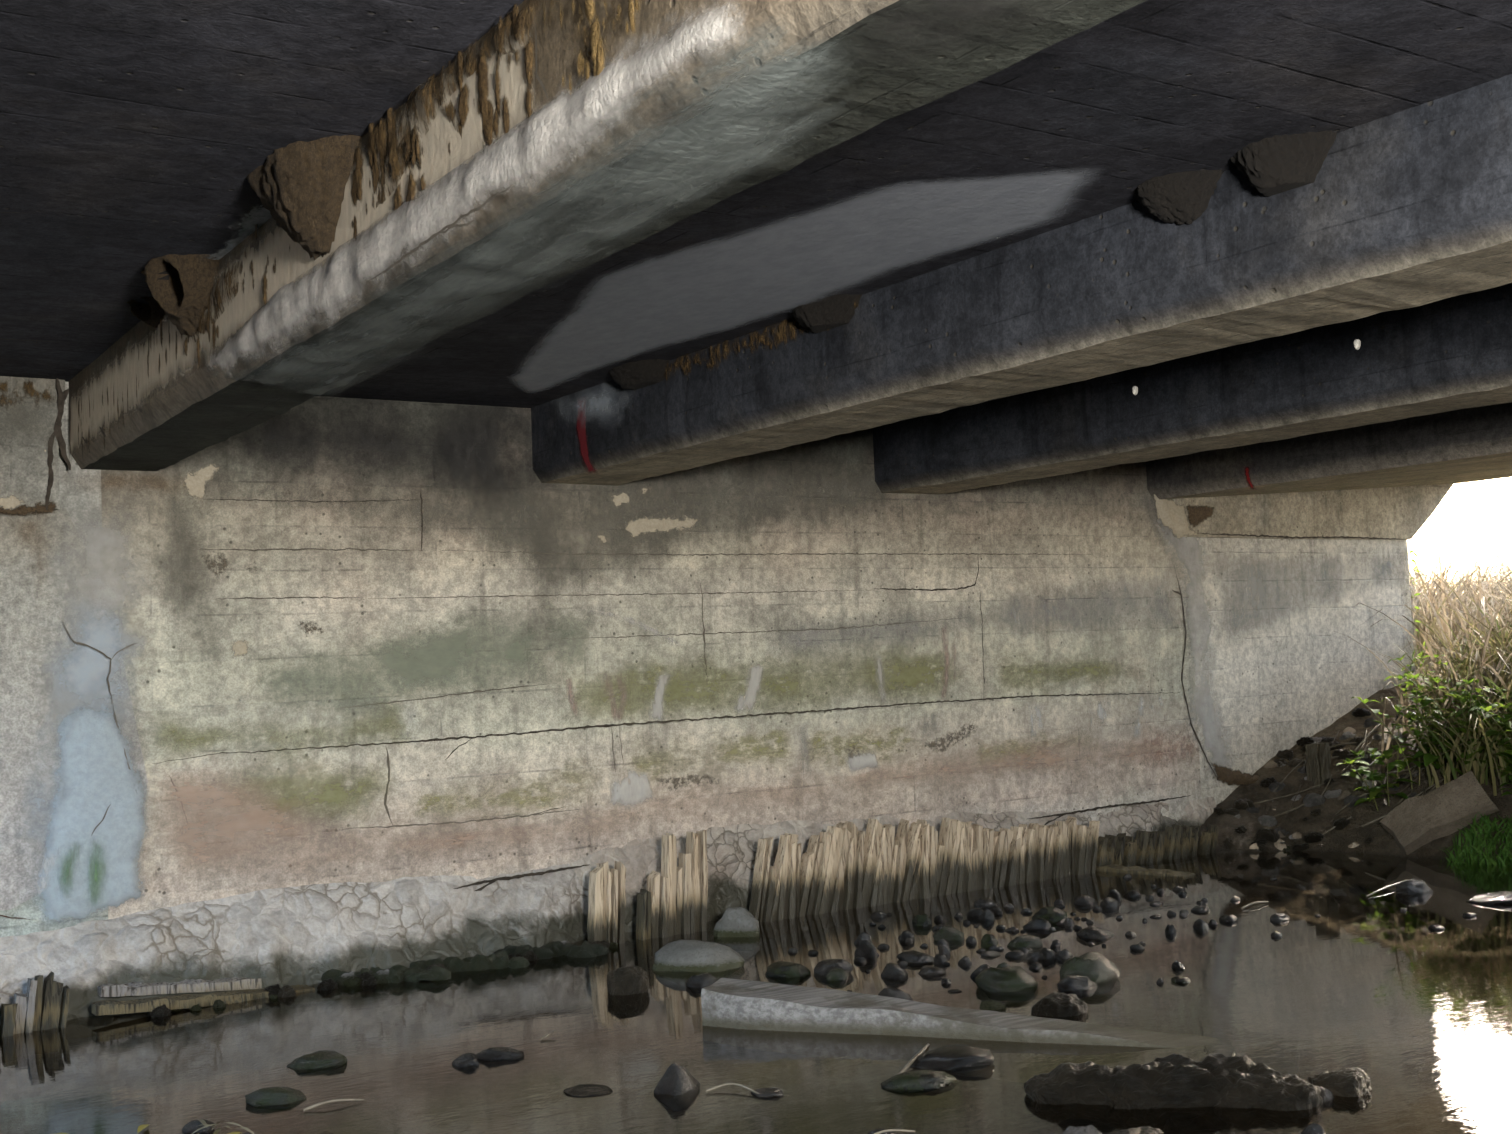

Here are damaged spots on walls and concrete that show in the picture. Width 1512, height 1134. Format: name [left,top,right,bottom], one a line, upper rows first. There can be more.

peeling [206,204,272,260]
damp [70,34,531,454]
spalling [366,184,513,284]
spalling [611,488,698,538]
damp [59,616,125,702]
damp [276,628,532,706]
damp [652,675,667,719]
damp [737,666,762,710]